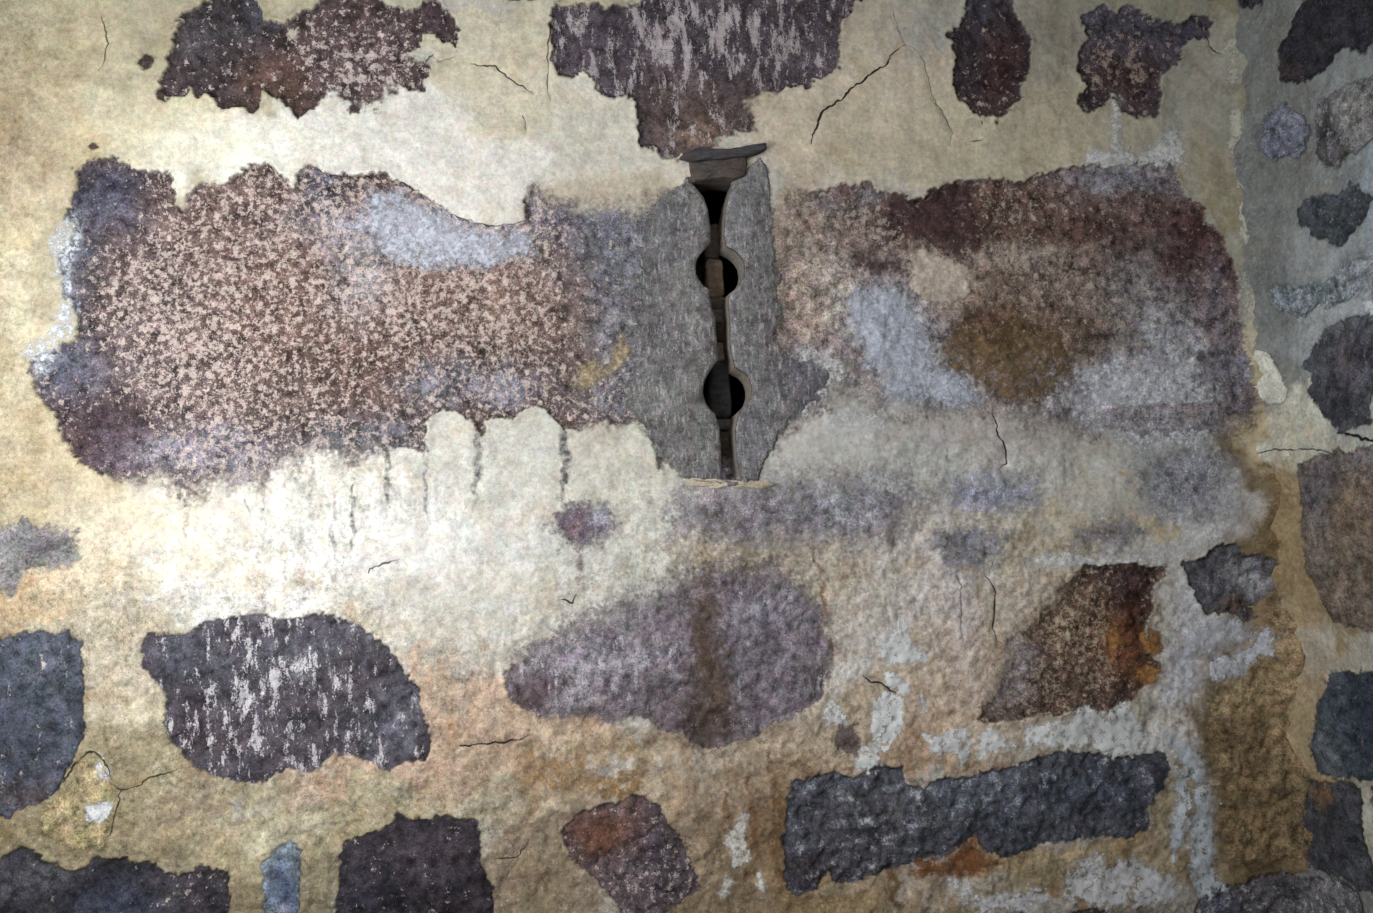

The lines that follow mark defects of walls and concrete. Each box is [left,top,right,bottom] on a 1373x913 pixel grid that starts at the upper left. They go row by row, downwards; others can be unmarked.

spalling [138,0,460,118]
crack [422,0,551,132]
spalling [549,0,862,162]
crack [811,9,983,145]
spalling [26,142,655,507]
spalling [773,0,1288,522]
spalling [0,629,85,819]
spalling [140,611,431,783]
spalling [504,466,1307,913]
rust [1107,627,1163,685]
spalling [0,847,231,913]
spalling [335,813,494,913]